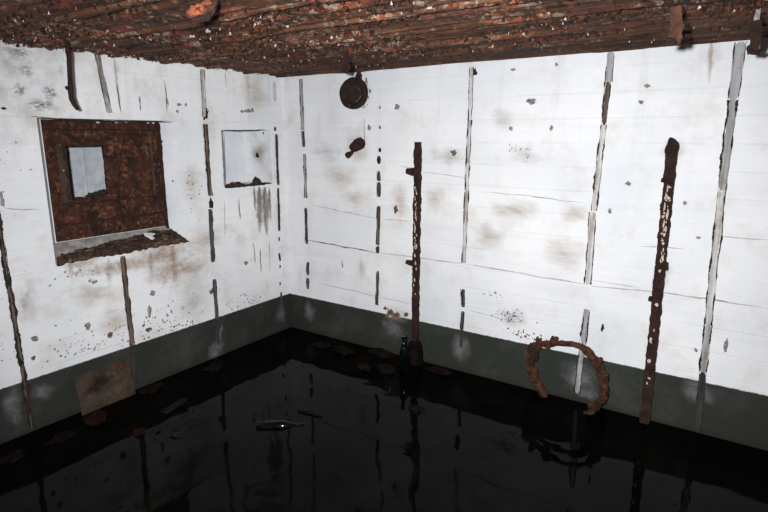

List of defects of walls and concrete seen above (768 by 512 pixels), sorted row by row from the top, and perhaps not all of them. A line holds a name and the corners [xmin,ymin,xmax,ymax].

rust [681,0,767,44]
rust [0,0,669,93]
water stain [254,187,271,230]